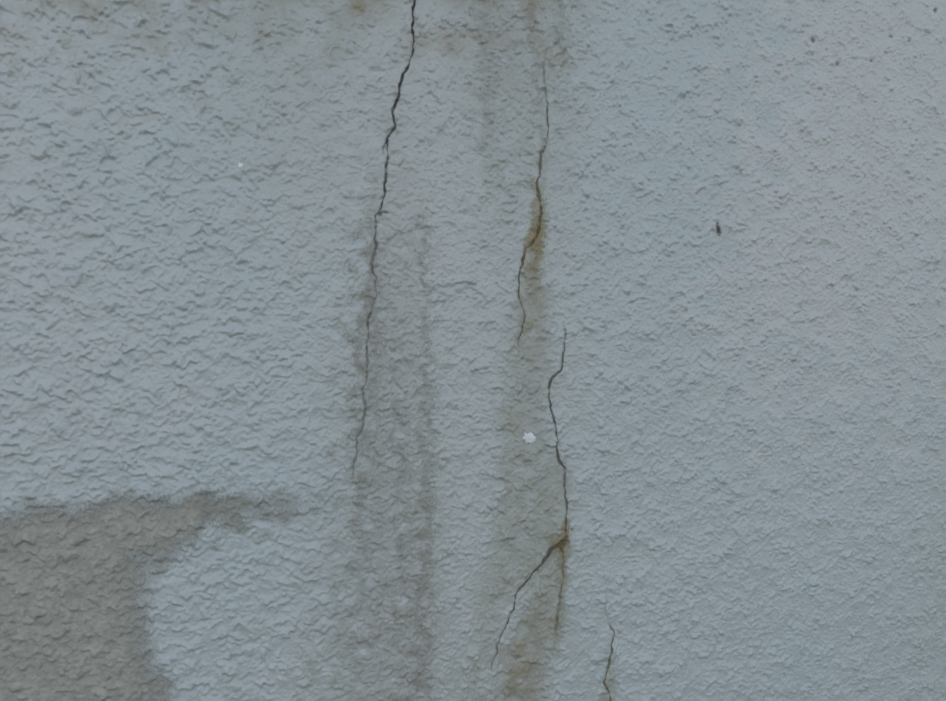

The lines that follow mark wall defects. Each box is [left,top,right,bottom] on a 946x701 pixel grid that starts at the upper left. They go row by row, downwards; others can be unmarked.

crack [371,0,415,282]
crack [518,108,549,337]
crack [496,332,568,654]
crack [604,629,615,701]